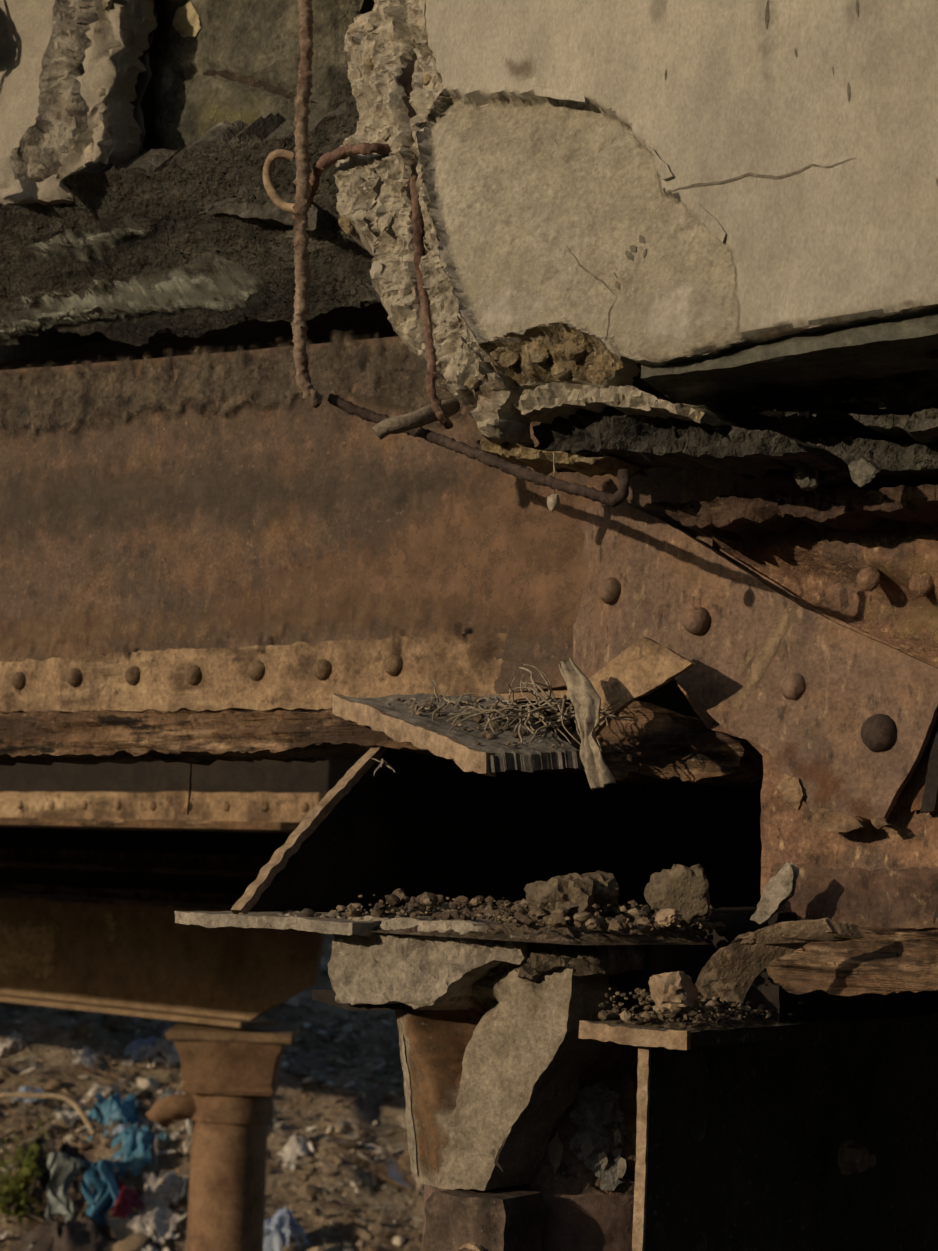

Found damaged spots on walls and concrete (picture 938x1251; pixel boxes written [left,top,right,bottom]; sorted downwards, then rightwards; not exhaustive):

spalling [9,0,116,182]
crack [658,158,854,198]
peeling [263,0,938,508]
corrosion [229,462,619,652]
corrosion [733,607,792,708]
spalling [488,930,658,983]
peeling [401,1034,418,1176]
peeling [569,1081,629,1191]